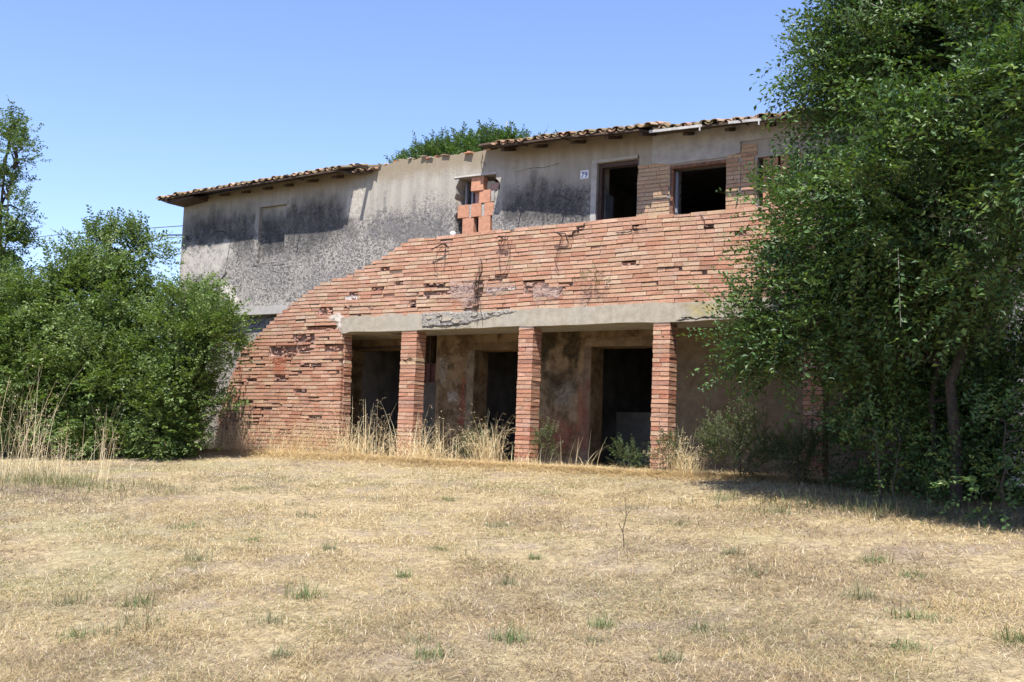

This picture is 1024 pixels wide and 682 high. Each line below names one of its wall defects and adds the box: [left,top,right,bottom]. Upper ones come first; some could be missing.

leakage [185,206,350,252]
leakage [507,188,585,221]
spalling [410,274,564,327]
spalling [269,291,375,380]
leakage [540,331,582,401]